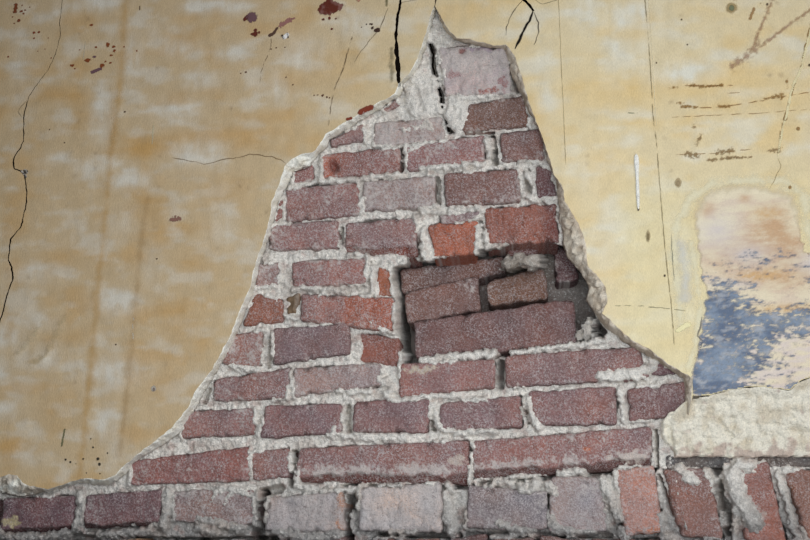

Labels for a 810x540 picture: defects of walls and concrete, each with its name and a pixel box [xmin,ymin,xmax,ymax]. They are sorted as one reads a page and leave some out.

crack [380,0,413,87]
crack [506,0,559,49]
crack [0,4,62,321]
flaking render [499,252,631,356]
peeling [661,177,810,470]
flaking render [505,347,644,388]
flaking render [627,382,685,421]
flaking render [473,427,652,479]
flaking render [174,489,254,525]
flaking render [265,492,354,532]
flaking render [296,440,470,534]
flaking render [466,476,607,532]